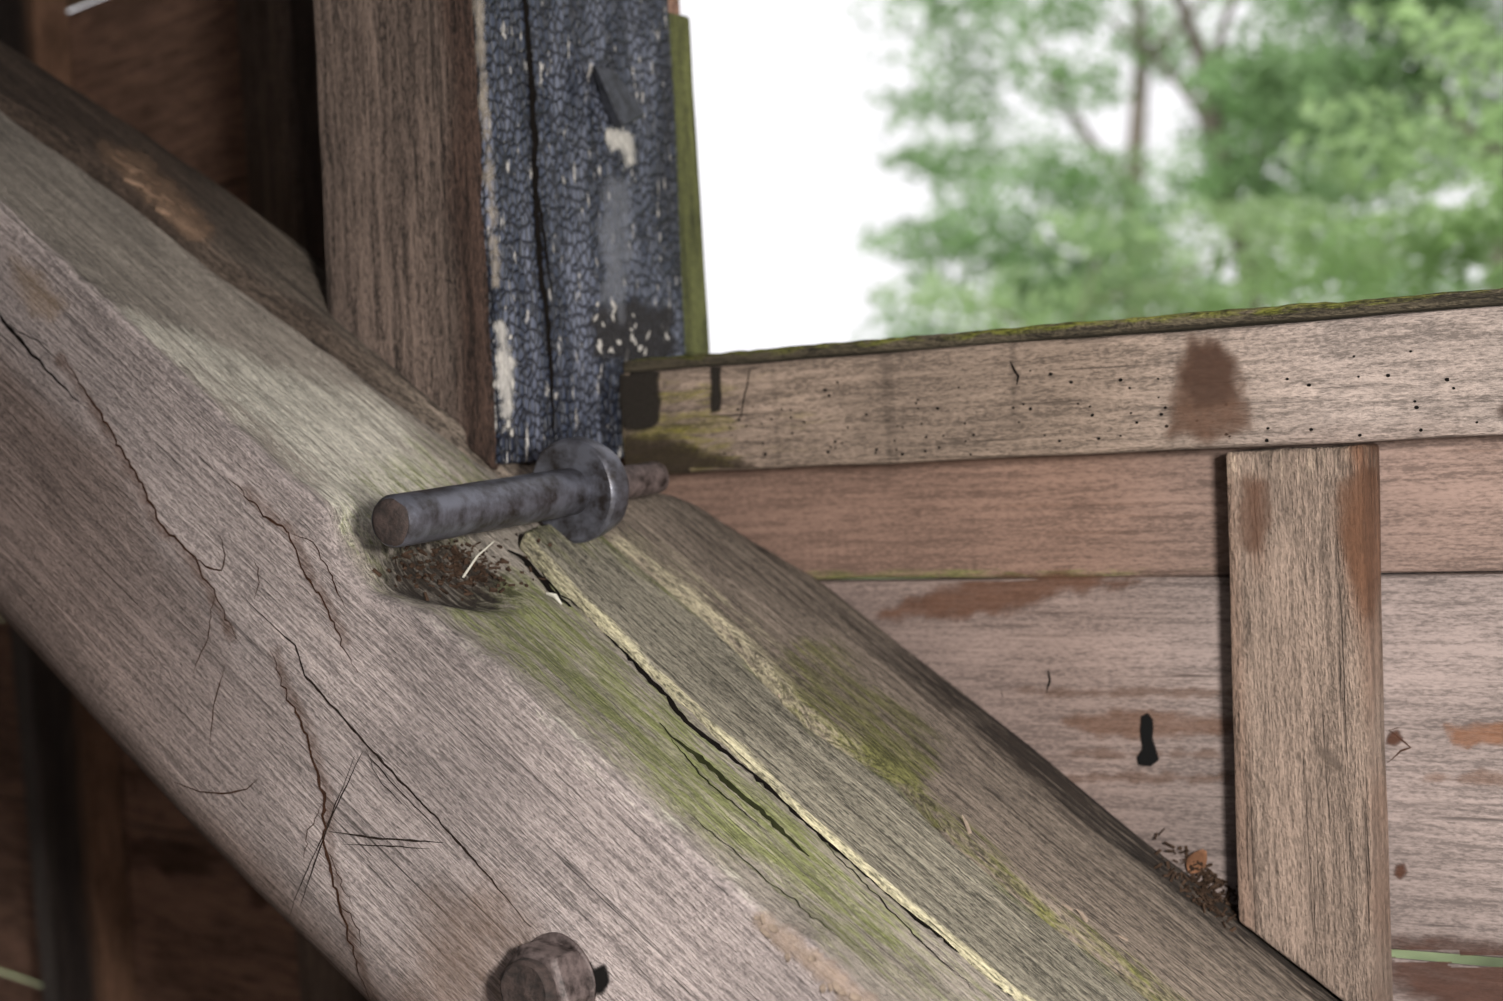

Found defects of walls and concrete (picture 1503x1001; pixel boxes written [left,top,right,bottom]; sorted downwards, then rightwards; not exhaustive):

peeling [606,128,633,165]
crack [523,0,555,429]
peeling [592,298,677,360]
peeling [493,321,515,437]
damp [1170,342,1247,439]
damp [882,574,1097,617]
crack [0,314,531,1001]